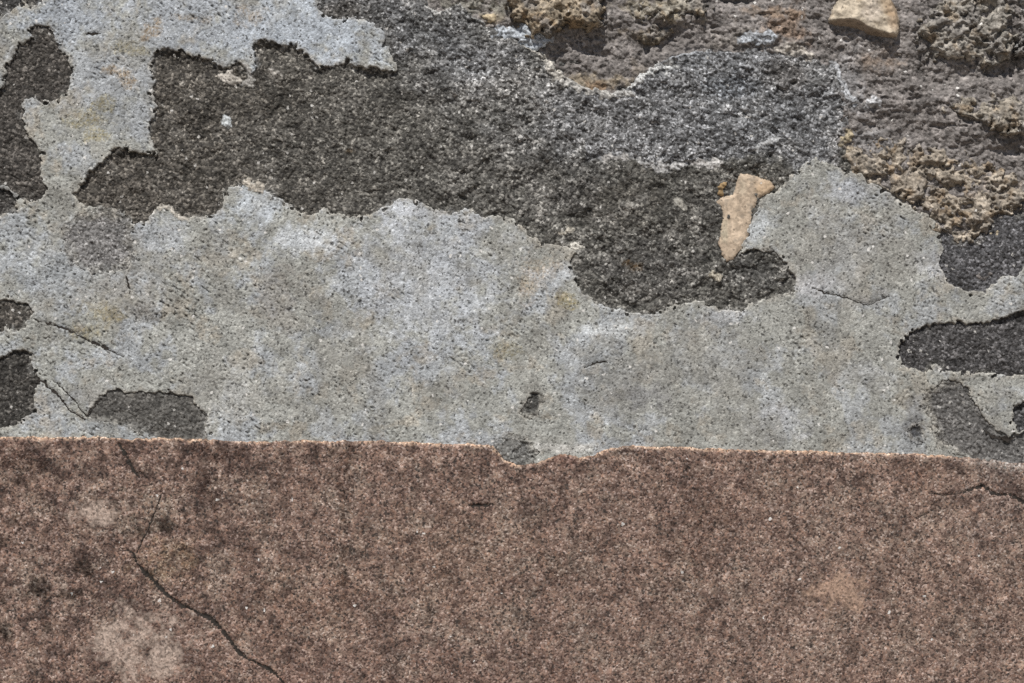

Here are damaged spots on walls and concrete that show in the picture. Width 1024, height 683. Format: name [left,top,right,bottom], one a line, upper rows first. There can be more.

spalling [0,25,74,216]
spalling [60,0,1024,316]
spalling [0,350,47,428]
spalling [85,388,212,439]
spalling [896,310,1024,469]
crack [118,444,285,683]